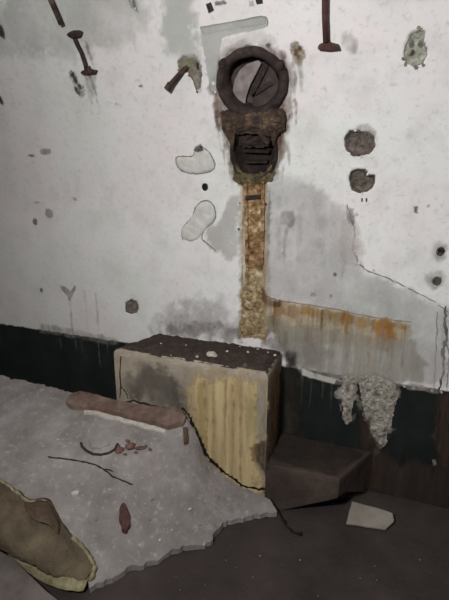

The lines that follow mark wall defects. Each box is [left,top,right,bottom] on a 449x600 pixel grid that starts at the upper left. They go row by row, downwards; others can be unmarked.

spalling [401,26,427,69]
rust [209,86,228,126]
rust [274,124,286,173]
spalling [344,129,375,157]
spalling [349,167,375,194]
rust [239,183,411,349]
spalling [125,299,138,314]
crack [434,306,449,390]
damp [272,326,425,475]
crack [119,356,302,536]